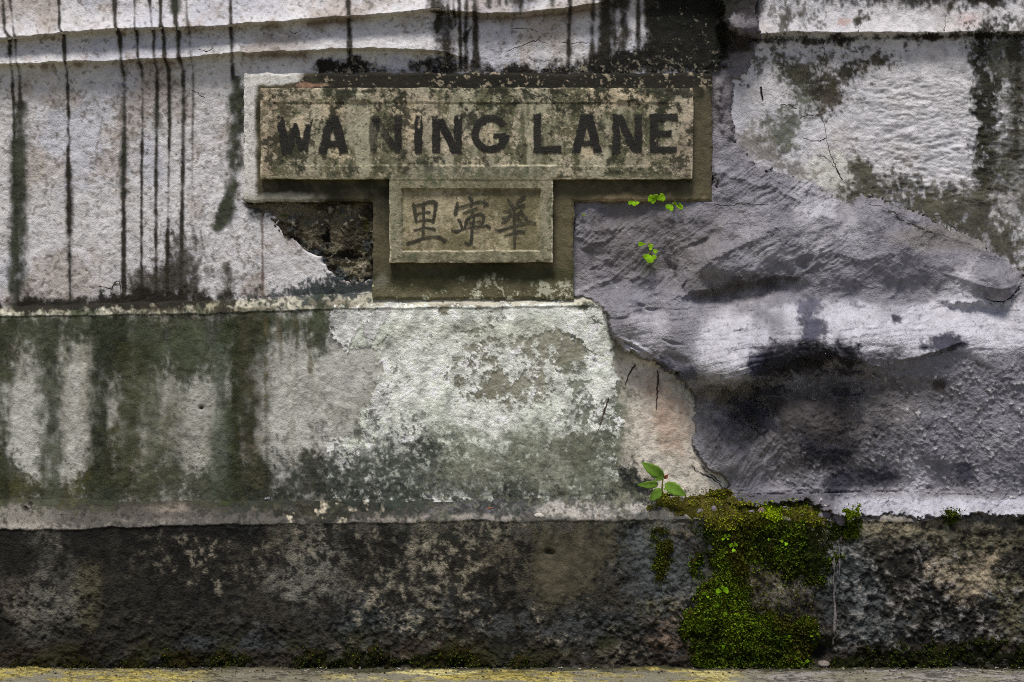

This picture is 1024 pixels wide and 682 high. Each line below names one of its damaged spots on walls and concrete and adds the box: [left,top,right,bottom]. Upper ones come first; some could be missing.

spalling [247,201,374,284]
water stain [0,0,658,539]
water stain [401,0,1024,271]
crack [781,104,843,180]
water stain [729,296,898,497]